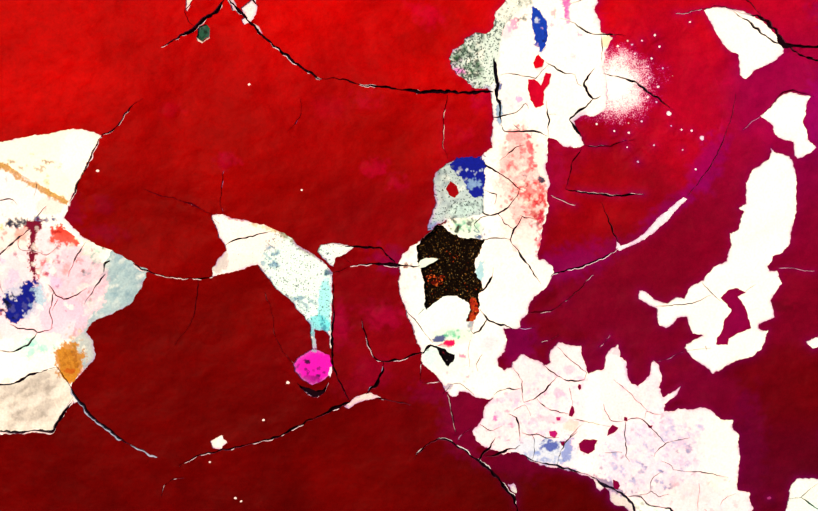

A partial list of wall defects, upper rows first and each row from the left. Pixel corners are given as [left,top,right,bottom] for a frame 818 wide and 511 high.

peeling [704,7,784,79]
crack [736,0,818,61]
peeling [0,129,148,435]
crack [144,171,224,213]
peeling [212,214,353,385]
crack [163,0,716,511]
peeling [398,0,753,511]
peeling [638,92,816,374]
peeling [786,478,818,511]